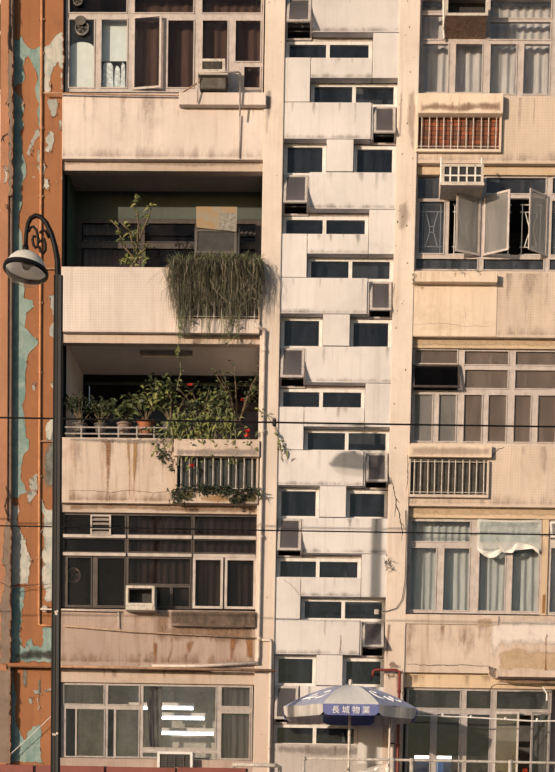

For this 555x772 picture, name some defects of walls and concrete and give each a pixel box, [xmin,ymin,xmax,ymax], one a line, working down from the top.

peeling [3,31,64,252]
peeling [0,280,53,764]
corrosion [128,442,137,480]